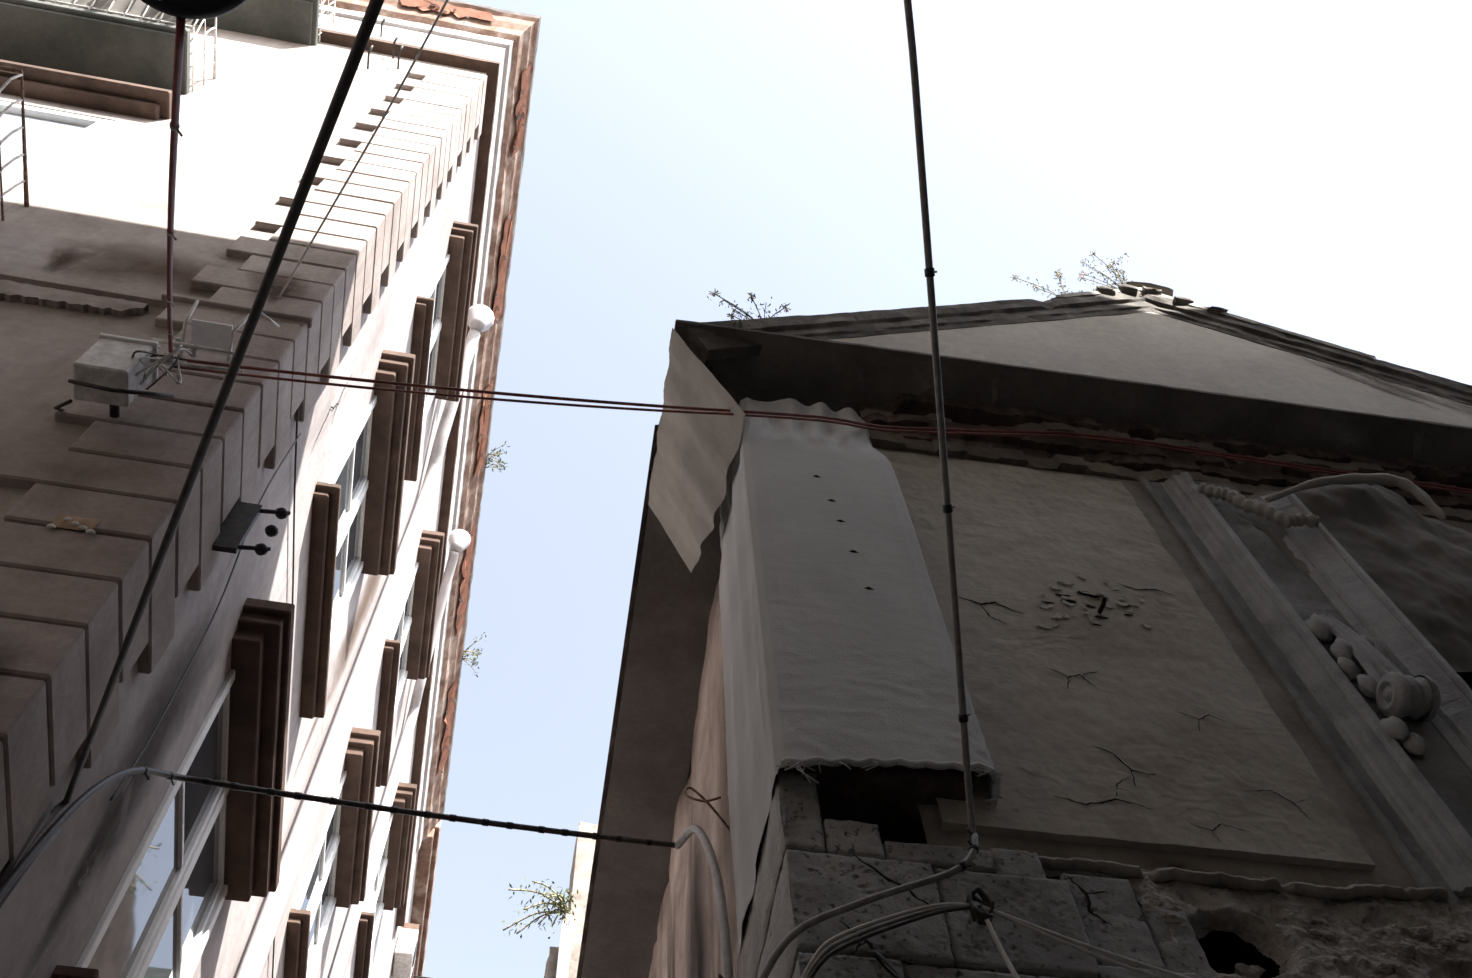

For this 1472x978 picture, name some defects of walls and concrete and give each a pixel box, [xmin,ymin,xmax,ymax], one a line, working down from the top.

crack [1117,581,1175,596]
spalling [1126,868,1472,978]